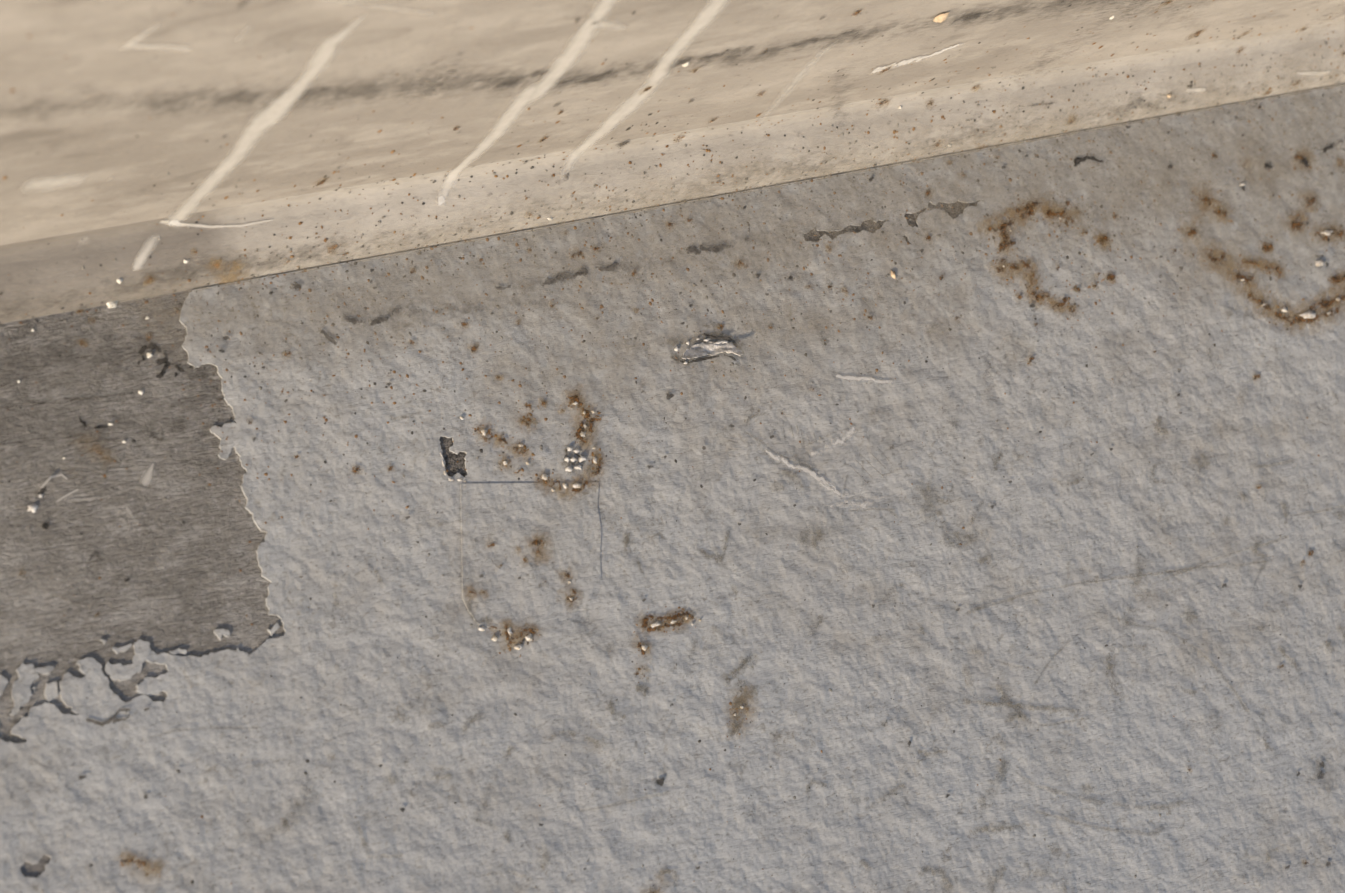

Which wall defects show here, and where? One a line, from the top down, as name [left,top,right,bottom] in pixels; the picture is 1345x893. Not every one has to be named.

water stain [170,17,375,221]
water stain [438,0,616,198]
water stain [564,0,778,173]
corrosion [984,194,1115,313]
corrosion [1174,191,1345,330]
corrosion [460,395,607,495]
peeling [0,293,285,743]
corrosion [478,618,540,657]
corrosion [631,602,701,690]